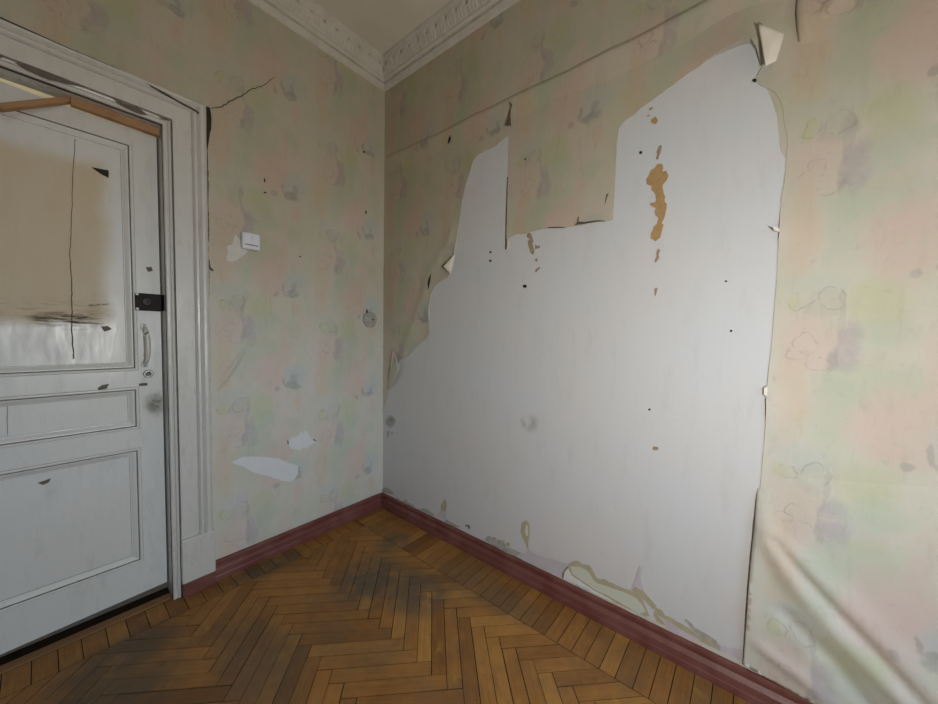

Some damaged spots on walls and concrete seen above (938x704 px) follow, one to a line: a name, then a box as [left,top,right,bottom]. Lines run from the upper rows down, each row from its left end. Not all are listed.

crack [210,77,274,109]
peeling [382,22,788,661]